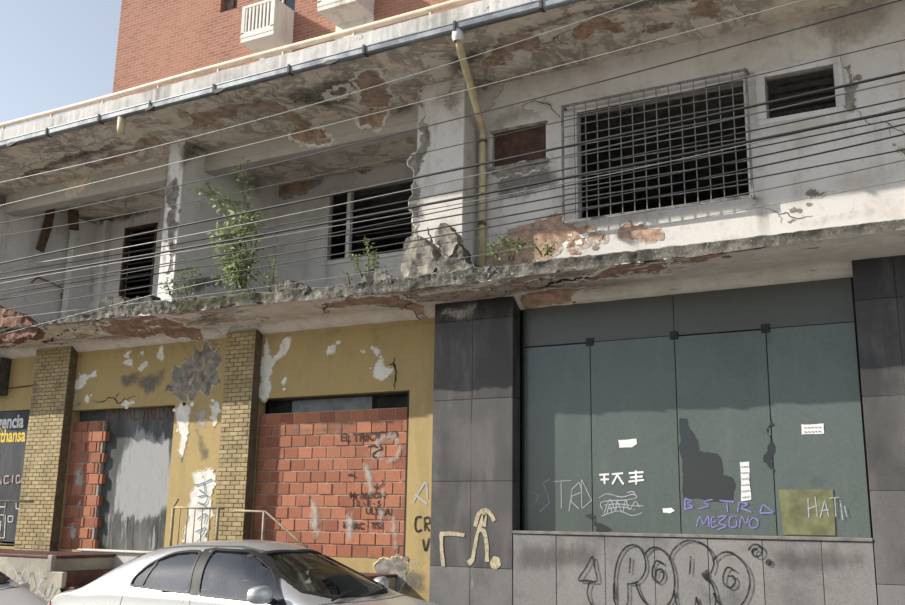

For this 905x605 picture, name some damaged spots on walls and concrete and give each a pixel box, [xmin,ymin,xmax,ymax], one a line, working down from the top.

peeling [569,15,625,41]
flaking render [843,64,862,114]
peeling [181,95,334,148]
peeling [320,68,433,235]
peeling [165,176,181,274]
flaking render [485,210,665,266]
crack [95,393,135,404]
flaking render [16,313,270,461]
peeling [259,336,292,403]